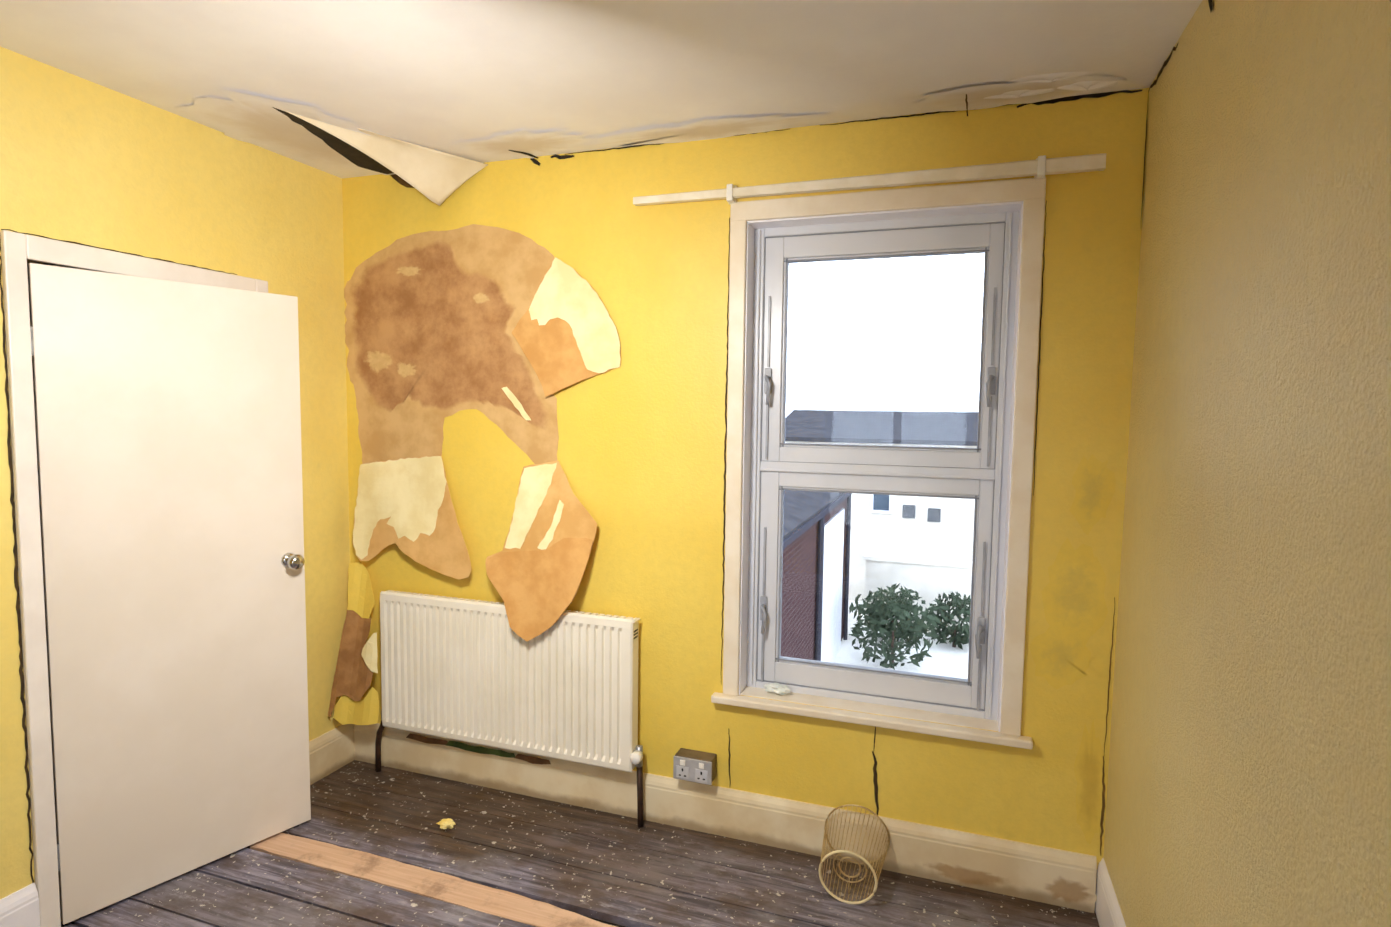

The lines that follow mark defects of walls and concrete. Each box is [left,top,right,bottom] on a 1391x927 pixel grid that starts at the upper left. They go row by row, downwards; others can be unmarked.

peeling [511,257,621,397]
peeling [328,456,597,725]
crack [871,727,879,815]